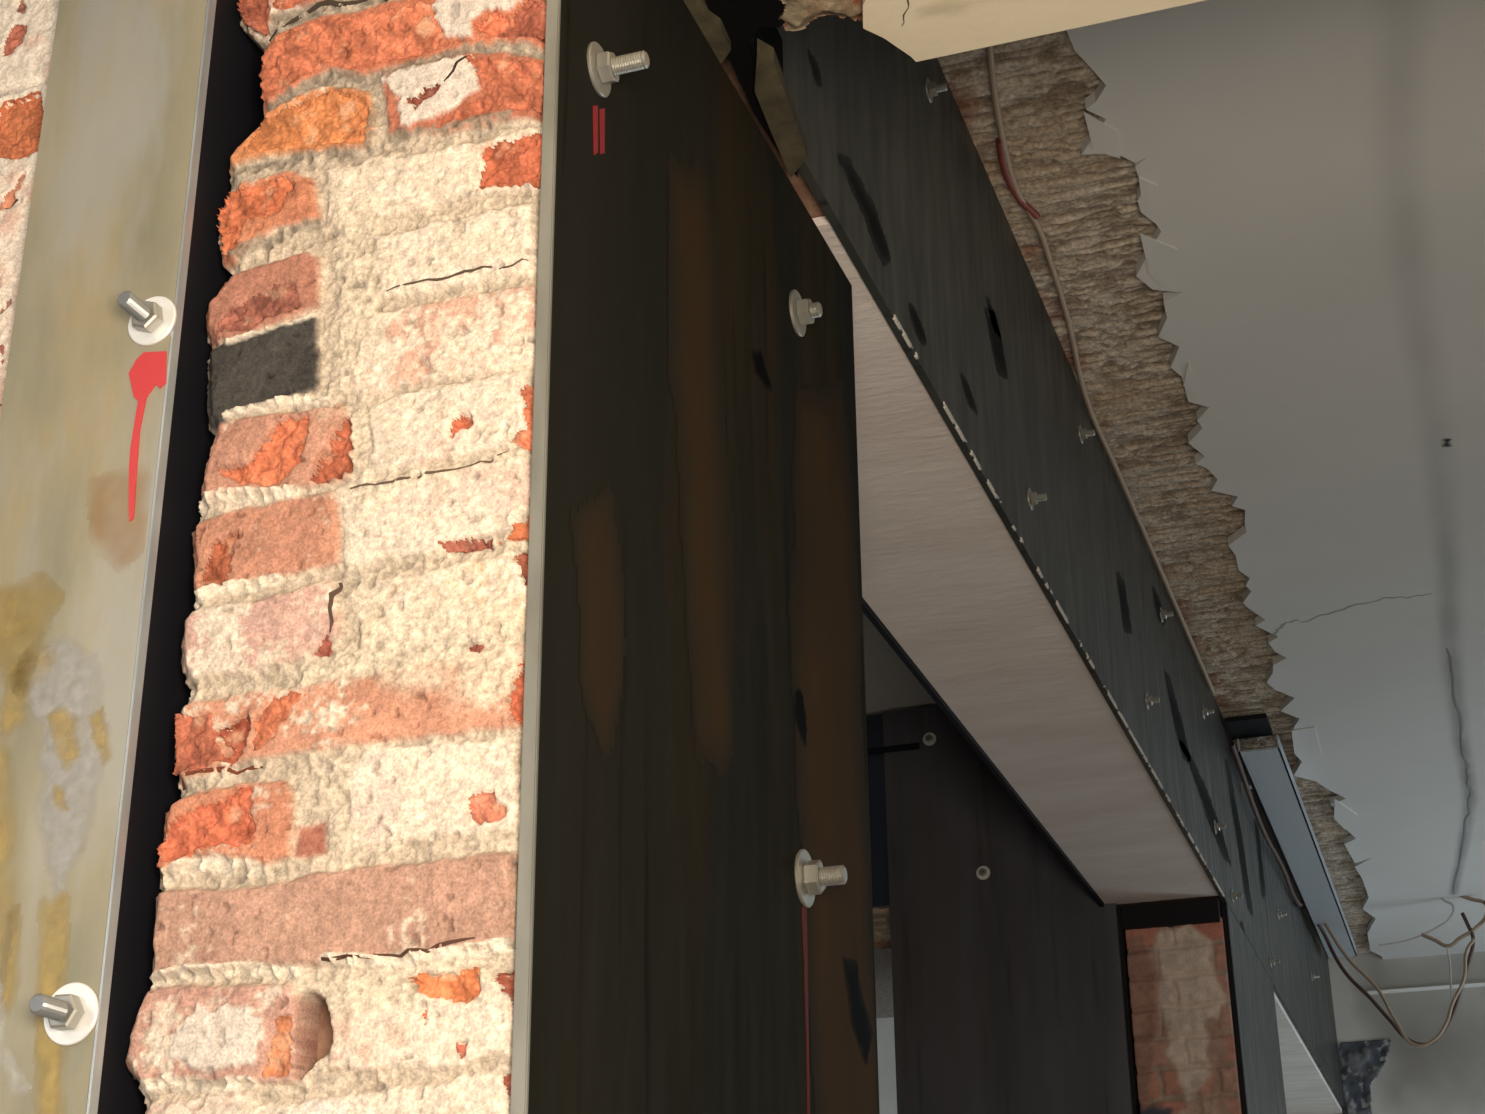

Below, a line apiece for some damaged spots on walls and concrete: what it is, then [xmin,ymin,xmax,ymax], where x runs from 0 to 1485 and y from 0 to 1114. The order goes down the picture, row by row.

spalling [3,0,27,56]
crack [269,0,388,42]
spalling [779,0,863,31]
spalling [0,91,44,210]
crack [386,258,528,292]
spalling [937,30,1373,954]
crack [1273,593,1432,636]
crack [1446,648,1474,894]
crack [321,937,475,962]